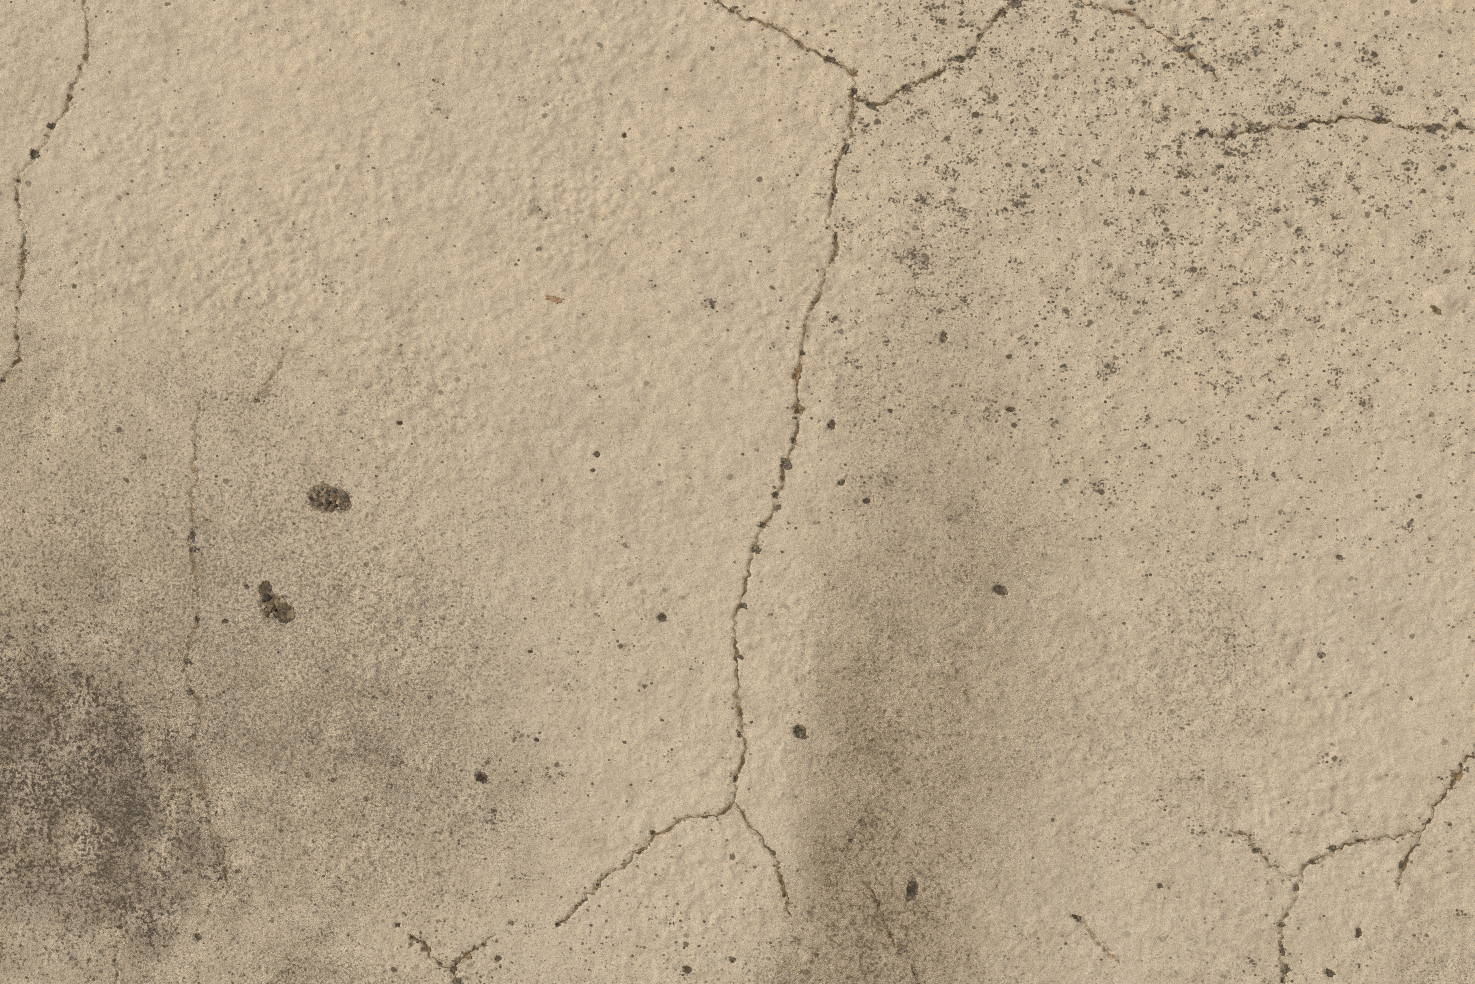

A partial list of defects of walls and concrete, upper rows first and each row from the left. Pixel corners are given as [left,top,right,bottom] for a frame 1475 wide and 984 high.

crack [0,0,89,383]
crack [1071,0,1220,82]
crack [1181,115,1470,139]
crack [555,0,1023,927]
leakage [0,484,270,984]
crack [394,920,514,984]
leakage [787,431,1018,984]
crack [1231,755,1475,984]